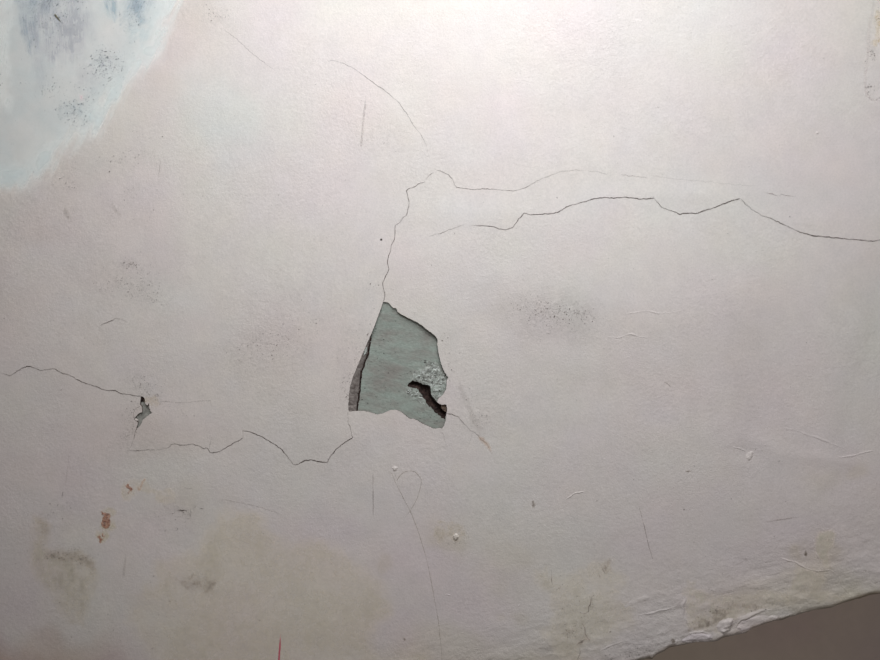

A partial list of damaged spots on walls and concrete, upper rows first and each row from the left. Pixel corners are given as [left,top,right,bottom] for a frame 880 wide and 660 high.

crack [481,197,740,230]
spalling [335,302,452,429]
spalling [122,386,166,438]
crack [177,423,353,465]